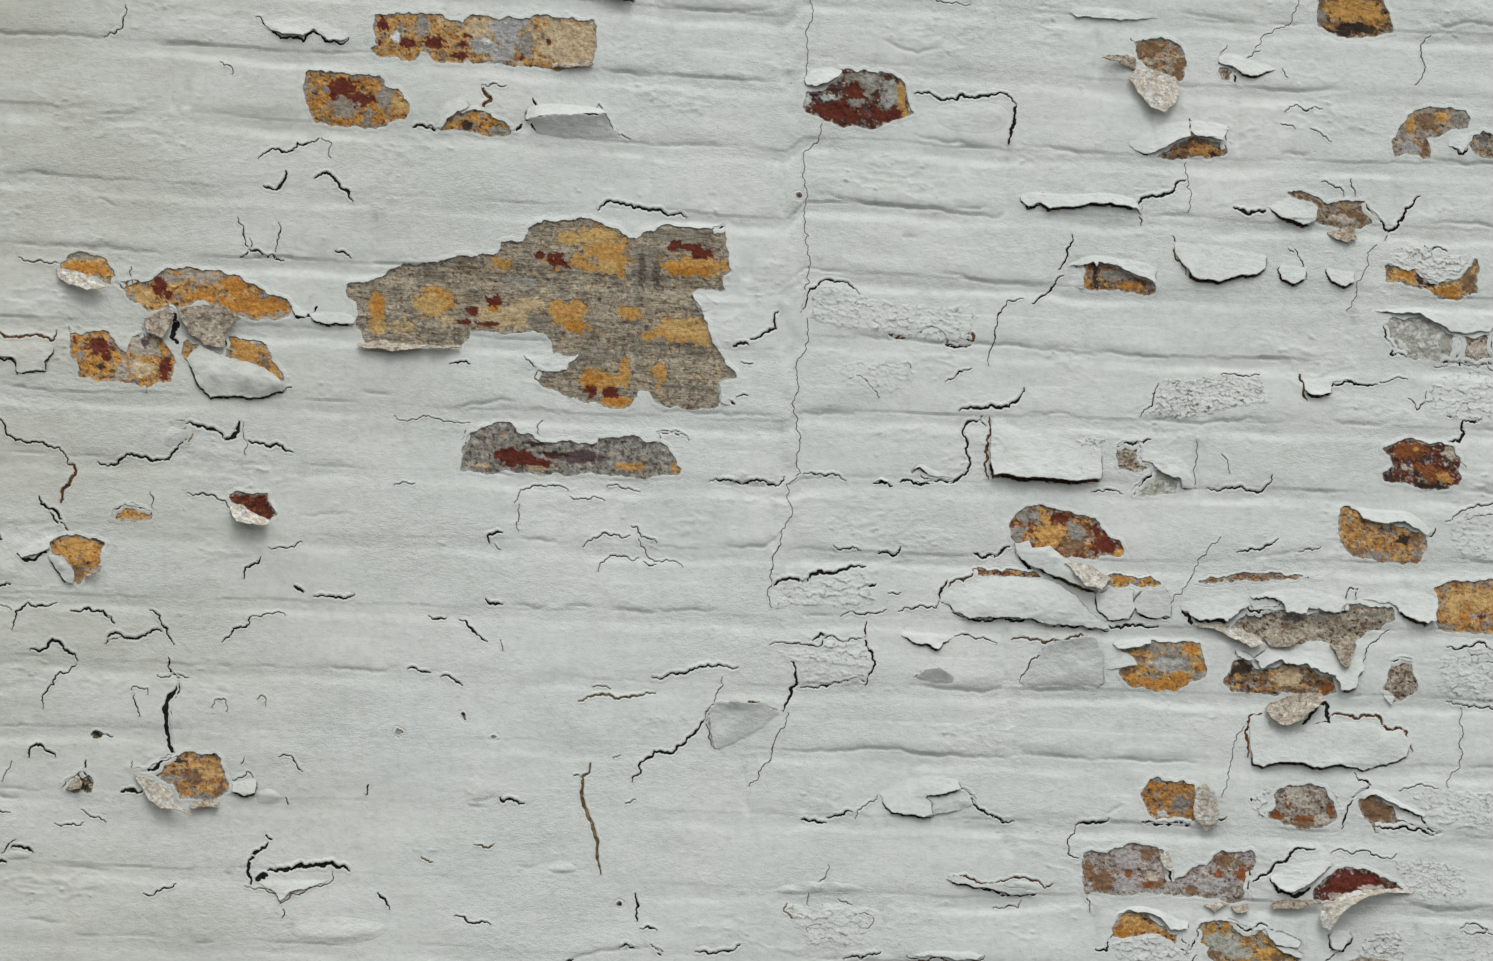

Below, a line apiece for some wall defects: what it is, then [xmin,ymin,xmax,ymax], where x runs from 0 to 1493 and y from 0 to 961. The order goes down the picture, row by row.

peeling [1312,0,1398,42]
peeling [255,8,632,143]
peeling [798,64,1020,145]
peeling [1387,102,1493,164]
peeling [0,213,748,484]
crack [709,122,824,610]
crack [0,416,80,505]
crack [221,539,358,645]
peeling [704,178,1493,961]
crack [0,598,269,816]
crack [799,814,827,827]
crack [142,882,178,899]